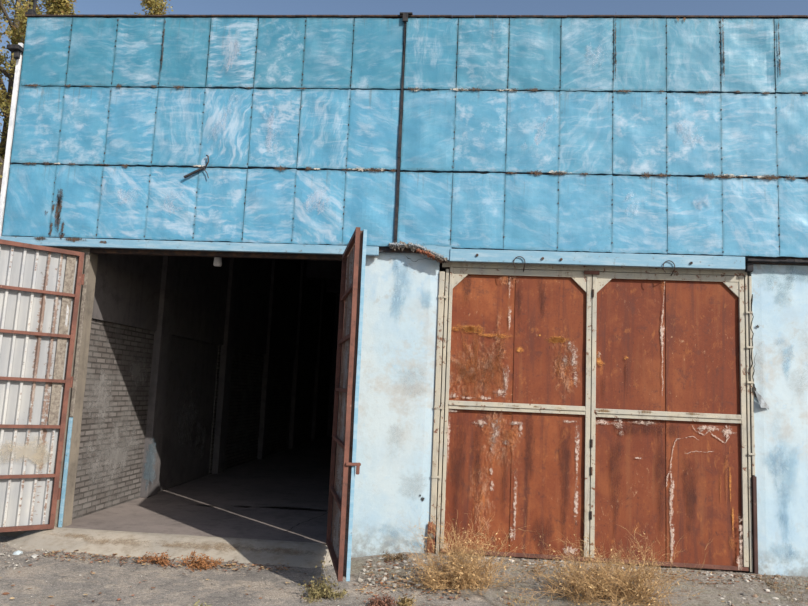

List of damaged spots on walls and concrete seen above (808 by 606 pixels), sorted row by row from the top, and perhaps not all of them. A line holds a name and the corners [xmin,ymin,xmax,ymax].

corrosion [35,189,86,242]
peeling [449,367,509,400]
peeling [666,425,737,561]